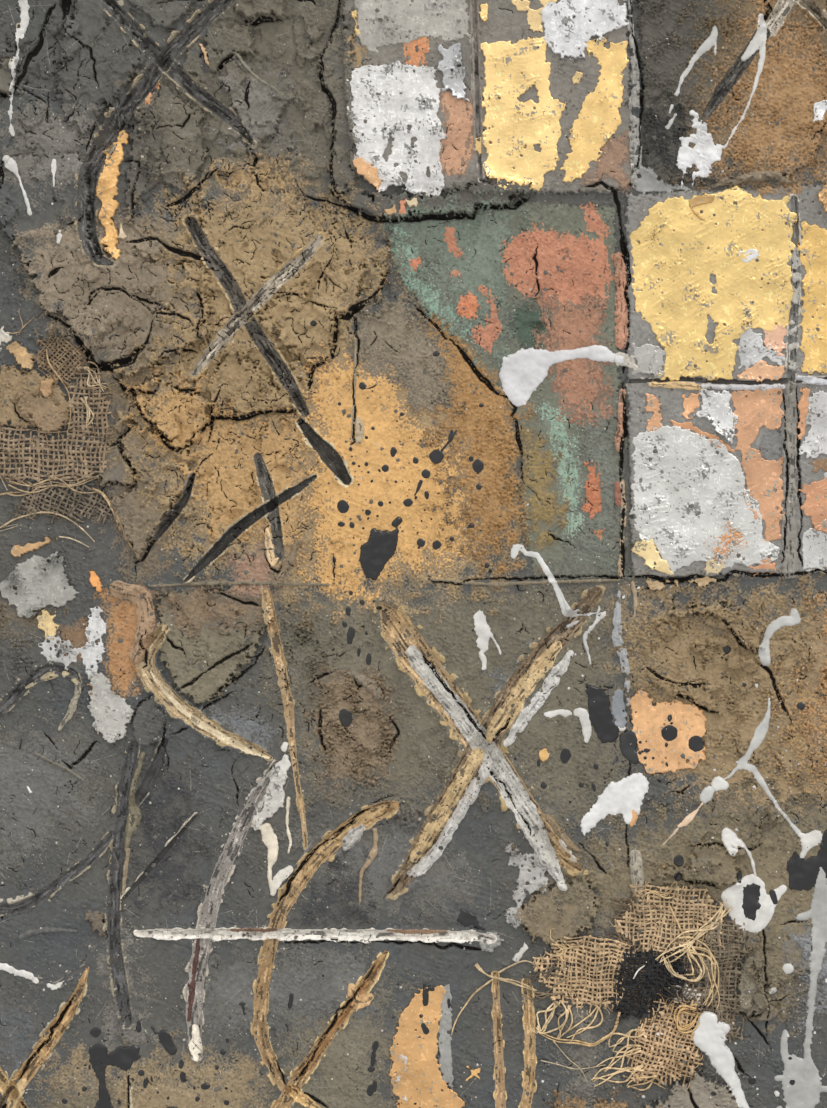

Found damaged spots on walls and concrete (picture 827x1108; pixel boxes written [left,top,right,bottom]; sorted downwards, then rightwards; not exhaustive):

crack [0,709,119,987]
crack [542,1045,627,1108]